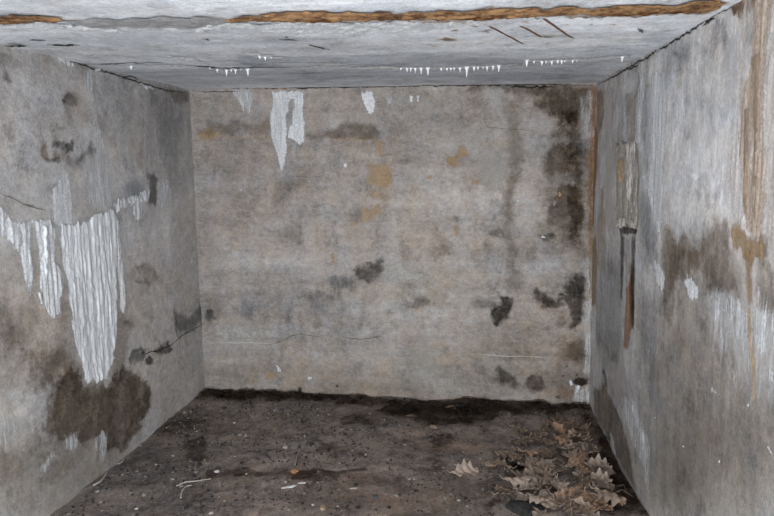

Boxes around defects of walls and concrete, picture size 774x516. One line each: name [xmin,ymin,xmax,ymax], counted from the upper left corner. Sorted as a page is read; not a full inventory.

crack [8,2,741,93]
damp [240,52,631,77]
damp [270,90,305,171]
corrosion [222,0,773,305]
damp [636,71,666,233]
damp [0,70,172,384]
damp [491,297,513,325]
damp [534,274,585,328]
damp [654,260,665,294]
damp [684,274,699,300]